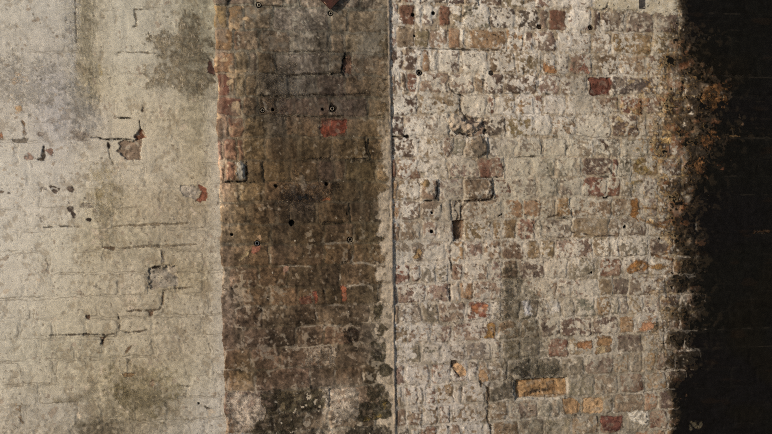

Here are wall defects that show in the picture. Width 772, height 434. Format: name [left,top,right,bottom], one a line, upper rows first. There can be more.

damp [143,14,215,95]
spalling [93,107,146,160]
peeling [180,185,207,202]
crack [53,287,187,352]
damp [226,305,393,434]